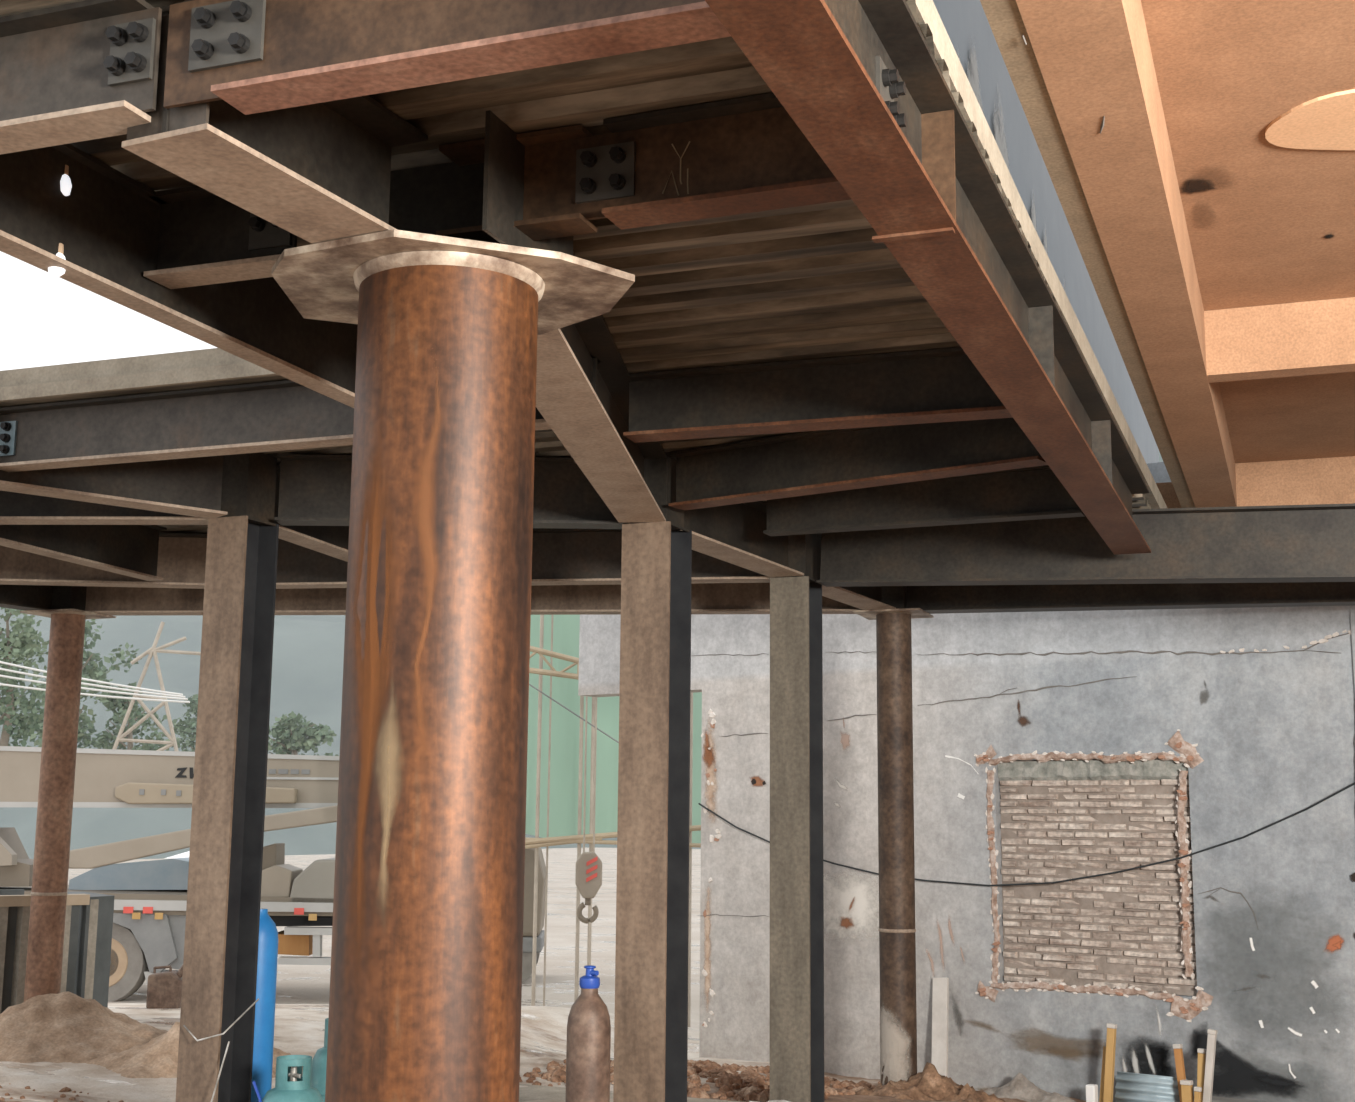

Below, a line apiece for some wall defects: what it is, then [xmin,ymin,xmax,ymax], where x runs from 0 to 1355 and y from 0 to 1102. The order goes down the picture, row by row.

corrosion [356,468,388,912]
flaking render [701,709,721,843]
crack [828,713,877,721]
crack [918,630,1352,706]
spalling [974,729,1214,1022]
flaking render [702,877,715,1028]